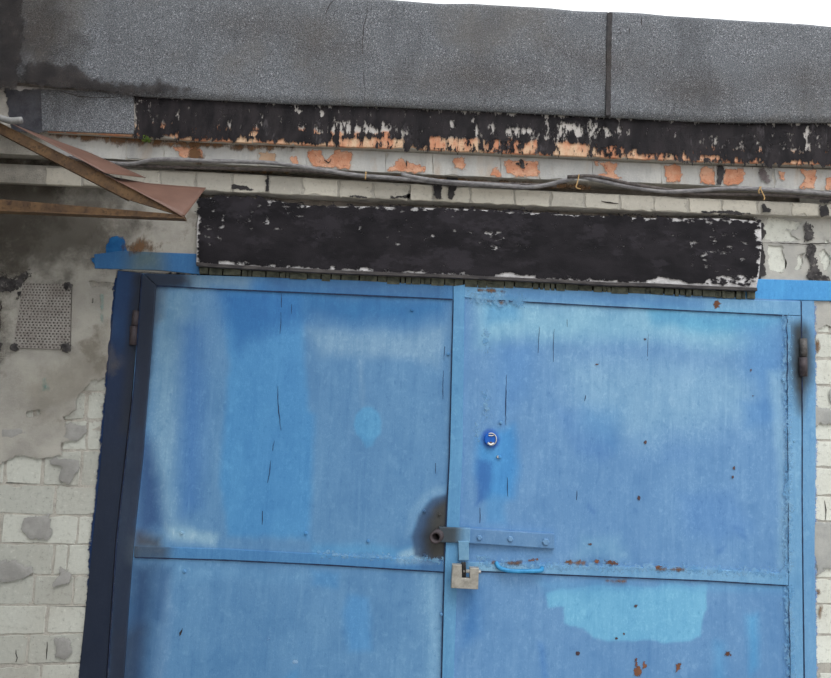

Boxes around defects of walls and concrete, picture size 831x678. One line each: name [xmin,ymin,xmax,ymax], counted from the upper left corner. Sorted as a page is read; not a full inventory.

spalling [173,146,203,158]
spalling [308,149,353,169]
spalling [387,158,426,174]
spalling [490,160,540,177]
corrosion [634,658,647,677]